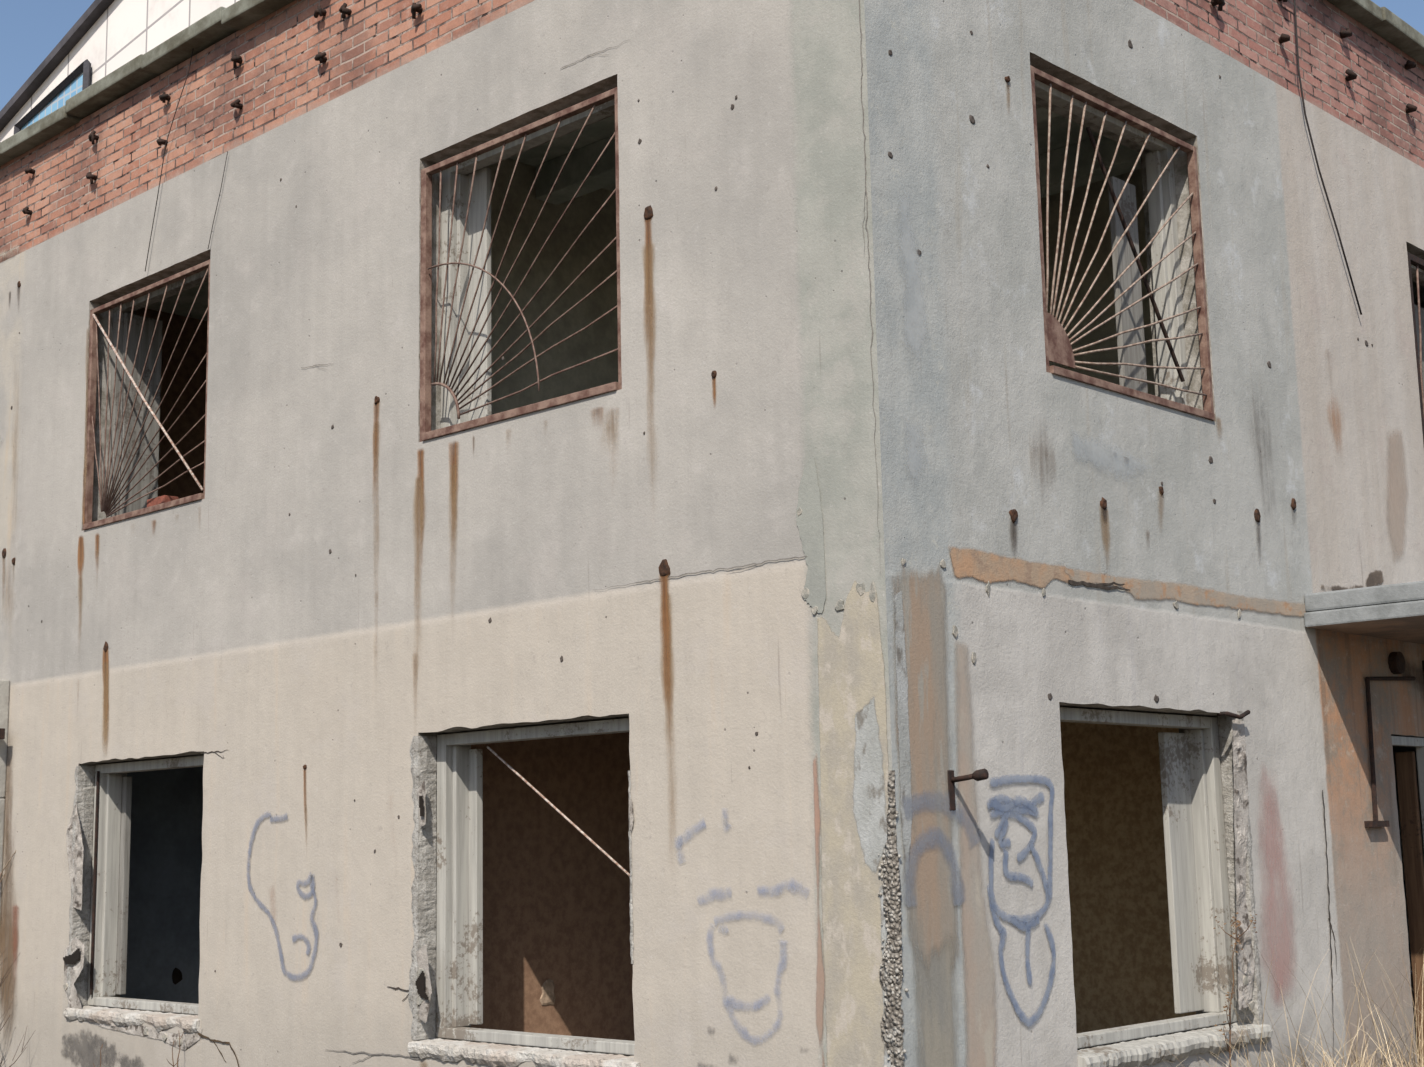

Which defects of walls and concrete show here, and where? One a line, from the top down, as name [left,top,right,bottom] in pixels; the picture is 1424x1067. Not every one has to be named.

corrosion [644,205,653,371]
corrosion [415,450,423,560]
corrosion [450,437,474,532]
peeling [1388,434,1406,555]
peeling [1321,570,1384,591]
corrosion [659,559,672,709]
spalling [66,804,84,910]
spalling [417,781,426,827]
peeling [796,457,1306,1067]
spalling [63,937,85,1009]
spalling [415,945,432,1023]
water stain [64,1032,141,1067]